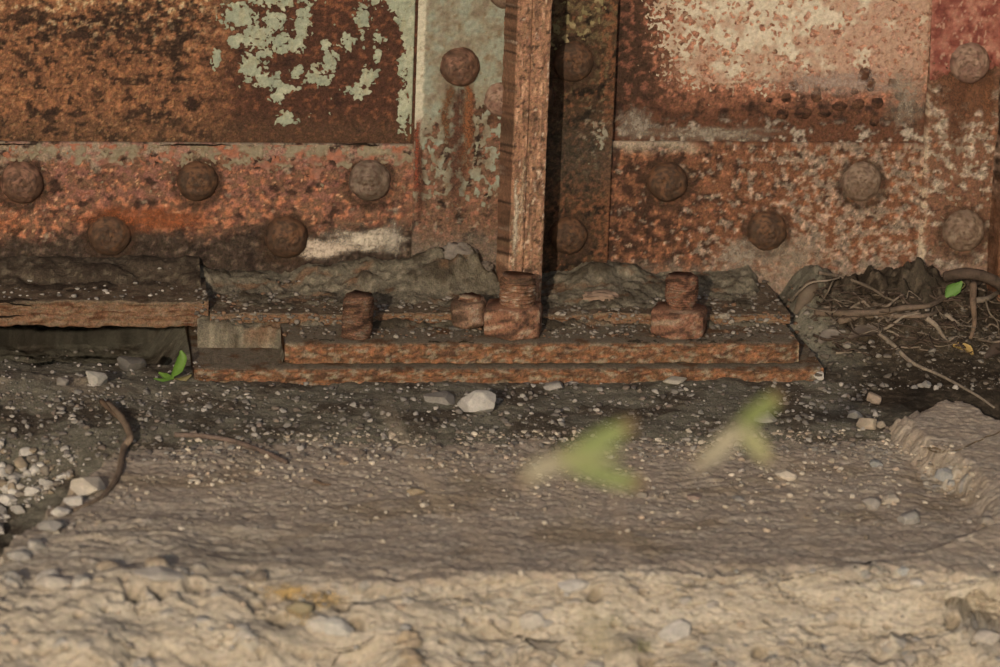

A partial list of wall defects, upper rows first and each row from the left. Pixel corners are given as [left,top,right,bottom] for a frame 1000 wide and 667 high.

peeling [0,0,505,210]
rust [414,122,424,218]
rust [441,85,473,192]
rust [513,165,526,249]
rust [766,67,918,128]